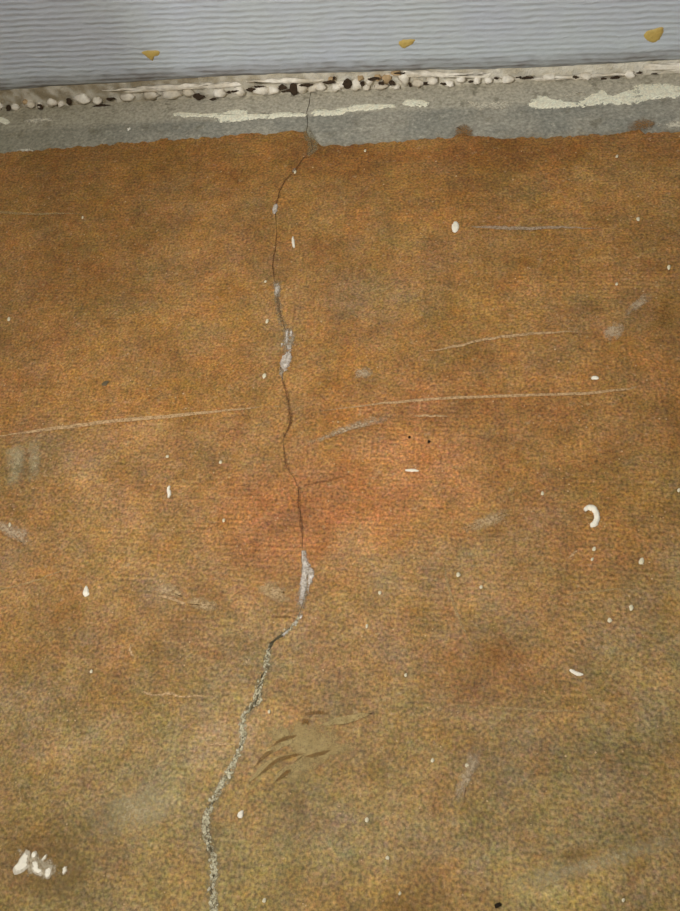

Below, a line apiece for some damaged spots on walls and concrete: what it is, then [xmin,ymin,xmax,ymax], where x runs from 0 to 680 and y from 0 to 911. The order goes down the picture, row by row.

crack [272,94,317,543]
crack [201,600,304,911]